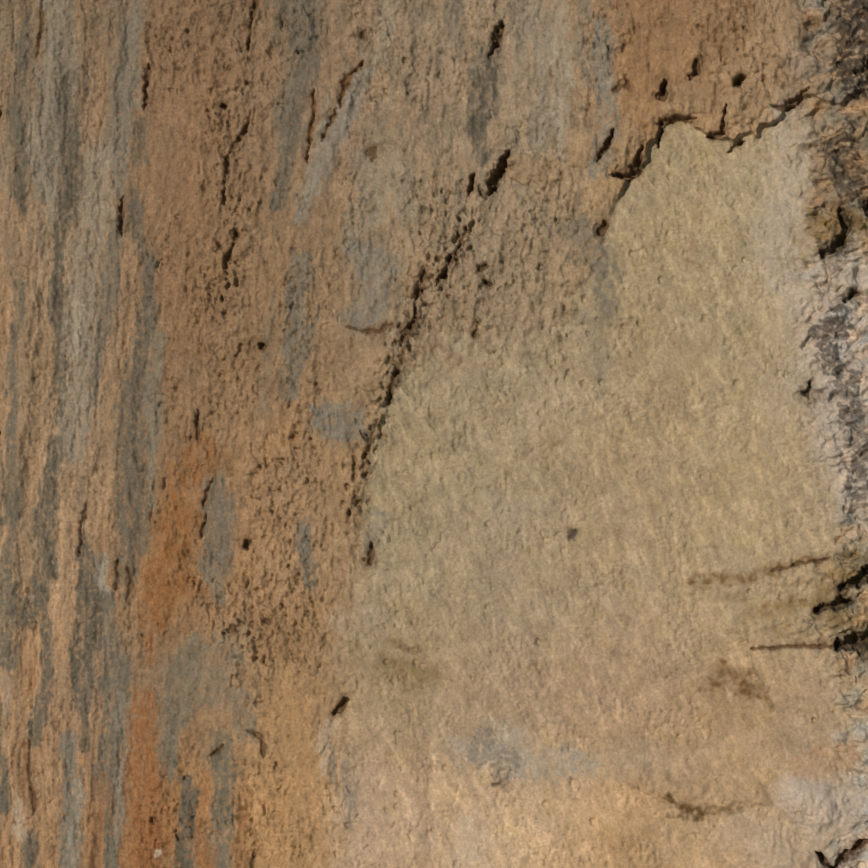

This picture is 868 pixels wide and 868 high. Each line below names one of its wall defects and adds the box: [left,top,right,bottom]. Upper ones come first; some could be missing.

crack [303,58,367,164]
crack [465,145,518,202]
spalling [777,0,868,213]
rust [137,407,301,671]
crack [343,223,473,524]
spalling [321,53,868,868]
crack [750,637,831,653]
crack [770,553,830,575]
rust [80,678,176,868]
crack [814,836,868,868]